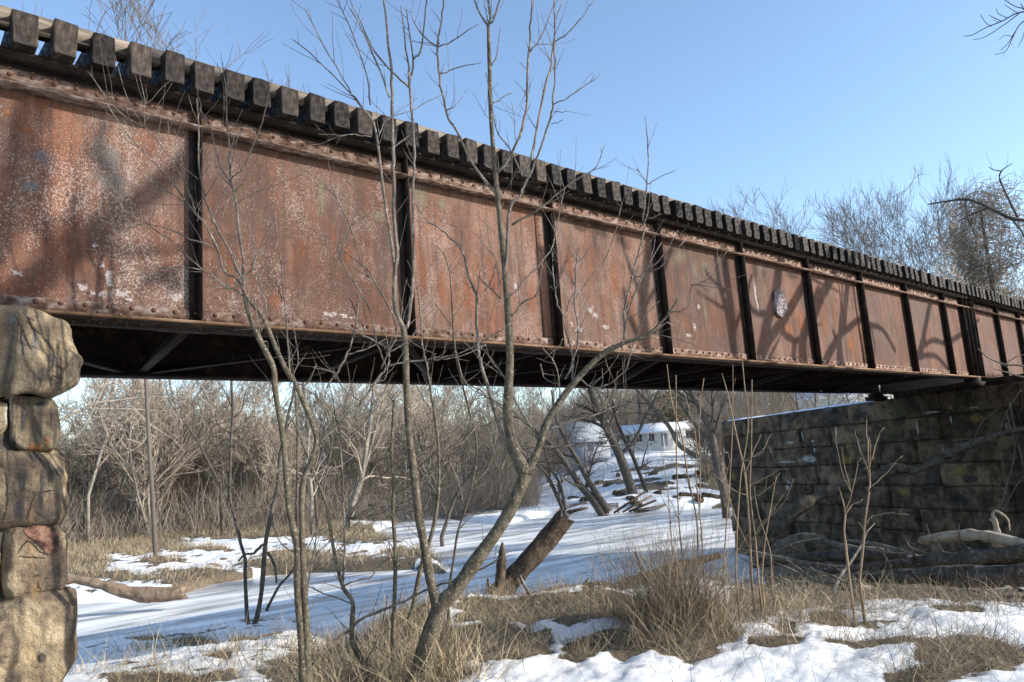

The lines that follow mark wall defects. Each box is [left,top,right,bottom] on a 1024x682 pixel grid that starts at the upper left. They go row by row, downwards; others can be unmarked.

peeling [77,261,133,303]